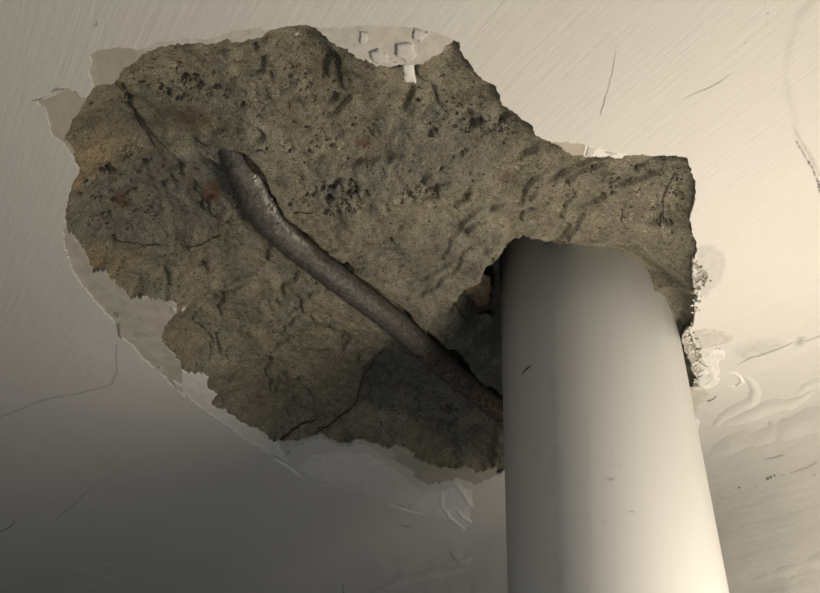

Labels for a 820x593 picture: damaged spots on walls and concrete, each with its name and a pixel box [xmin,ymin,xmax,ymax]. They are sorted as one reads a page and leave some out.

spalling [34,25,712,485]
crack [0,313,122,417]
crack [738,336,820,365]